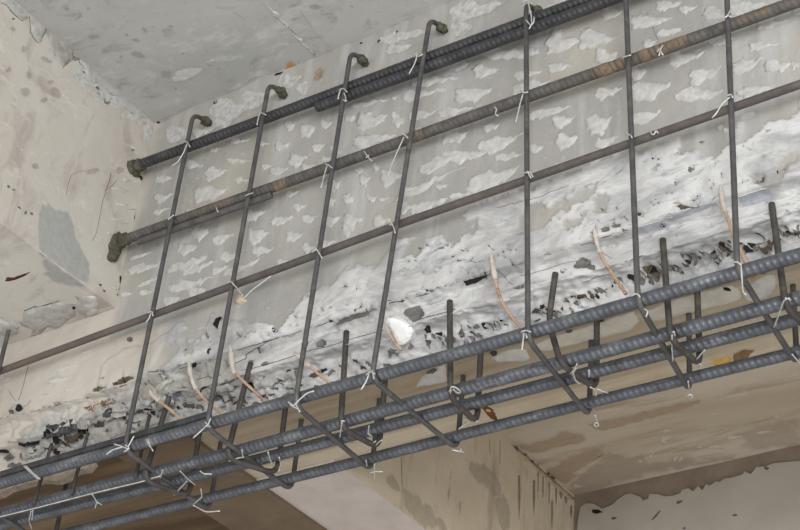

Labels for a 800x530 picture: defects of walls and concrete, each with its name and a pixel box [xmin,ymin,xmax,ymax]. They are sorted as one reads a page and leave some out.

corrosion [591,35,689,79]
spalling [591,179,717,238]
spalling [20,174,392,337]
spalling [524,224,800,322]
spalling [0,348,302,468]
flaking render [415,364,447,388]
flaking render [381,272,508,367]
flaking render [490,349,531,362]
flaking render [536,311,639,351]
peeling [514,414,800,500]
flaking render [577,461,800,530]